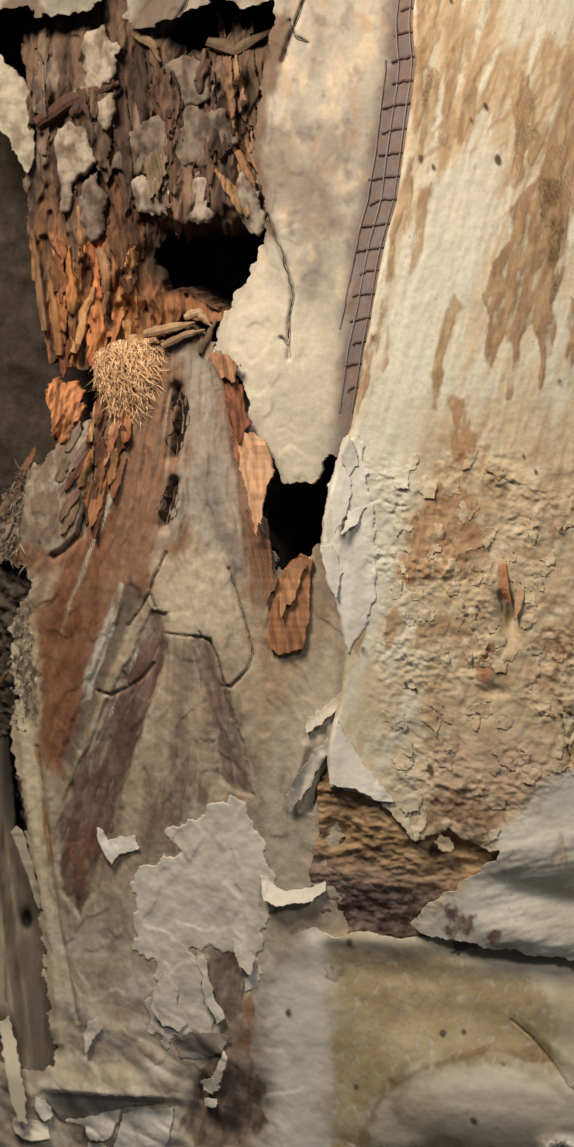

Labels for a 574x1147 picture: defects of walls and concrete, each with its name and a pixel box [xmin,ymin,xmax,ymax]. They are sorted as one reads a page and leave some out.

crack [284,0,308,58]
peeling [54,24,237,243]
damp [386,0,488,280]
damp [494,73,542,187]
crack [268,216,295,350]
damp [357,304,387,411]
damp [433,295,461,407]
peeling [320,432,436,654]
peeling [82,583,124,701]
crack [171,569,253,717]
flaking render [426,523,574,717]
peeling [10,612,501,1147]